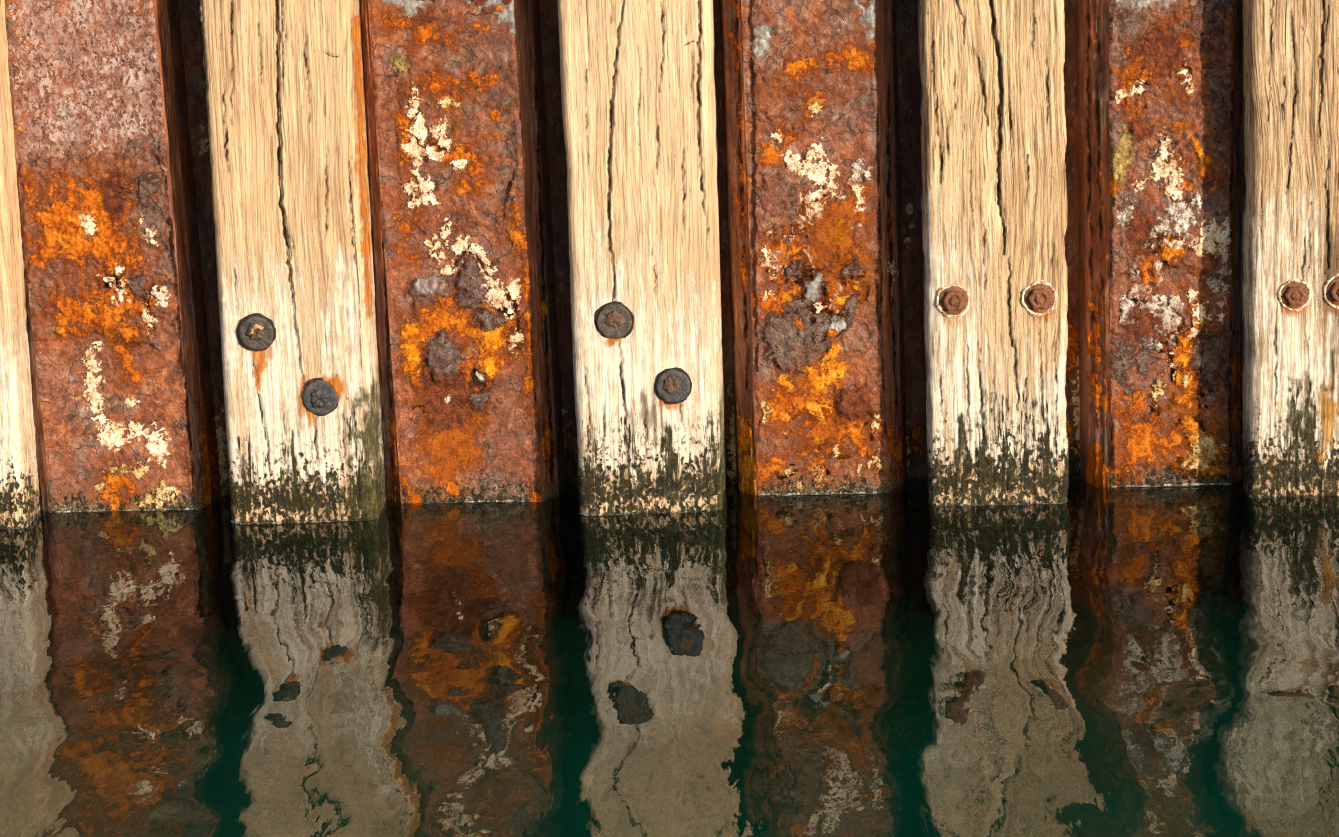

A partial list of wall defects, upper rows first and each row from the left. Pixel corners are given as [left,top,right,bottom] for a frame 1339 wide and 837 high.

water stain [0,311,37,497]
crack [199,0,356,386]
crack [253,356,345,470]
water stain [218,225,384,513]
crack [585,342,647,453]
water stain [569,224,724,505]
crack [585,0,710,301]
crack [928,0,1058,448]
water stain [921,173,1068,495]
water stain [1241,184,1339,488]
crack [1261,0,1339,274]
crack [1274,327,1333,406]